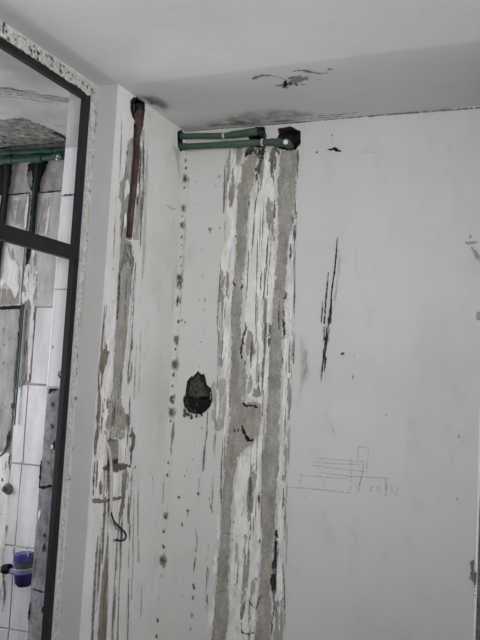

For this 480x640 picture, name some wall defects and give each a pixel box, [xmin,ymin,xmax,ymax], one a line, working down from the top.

peeling [94,243,135,497]
peeling [183,147,245,640]
peeling [226,127,301,640]